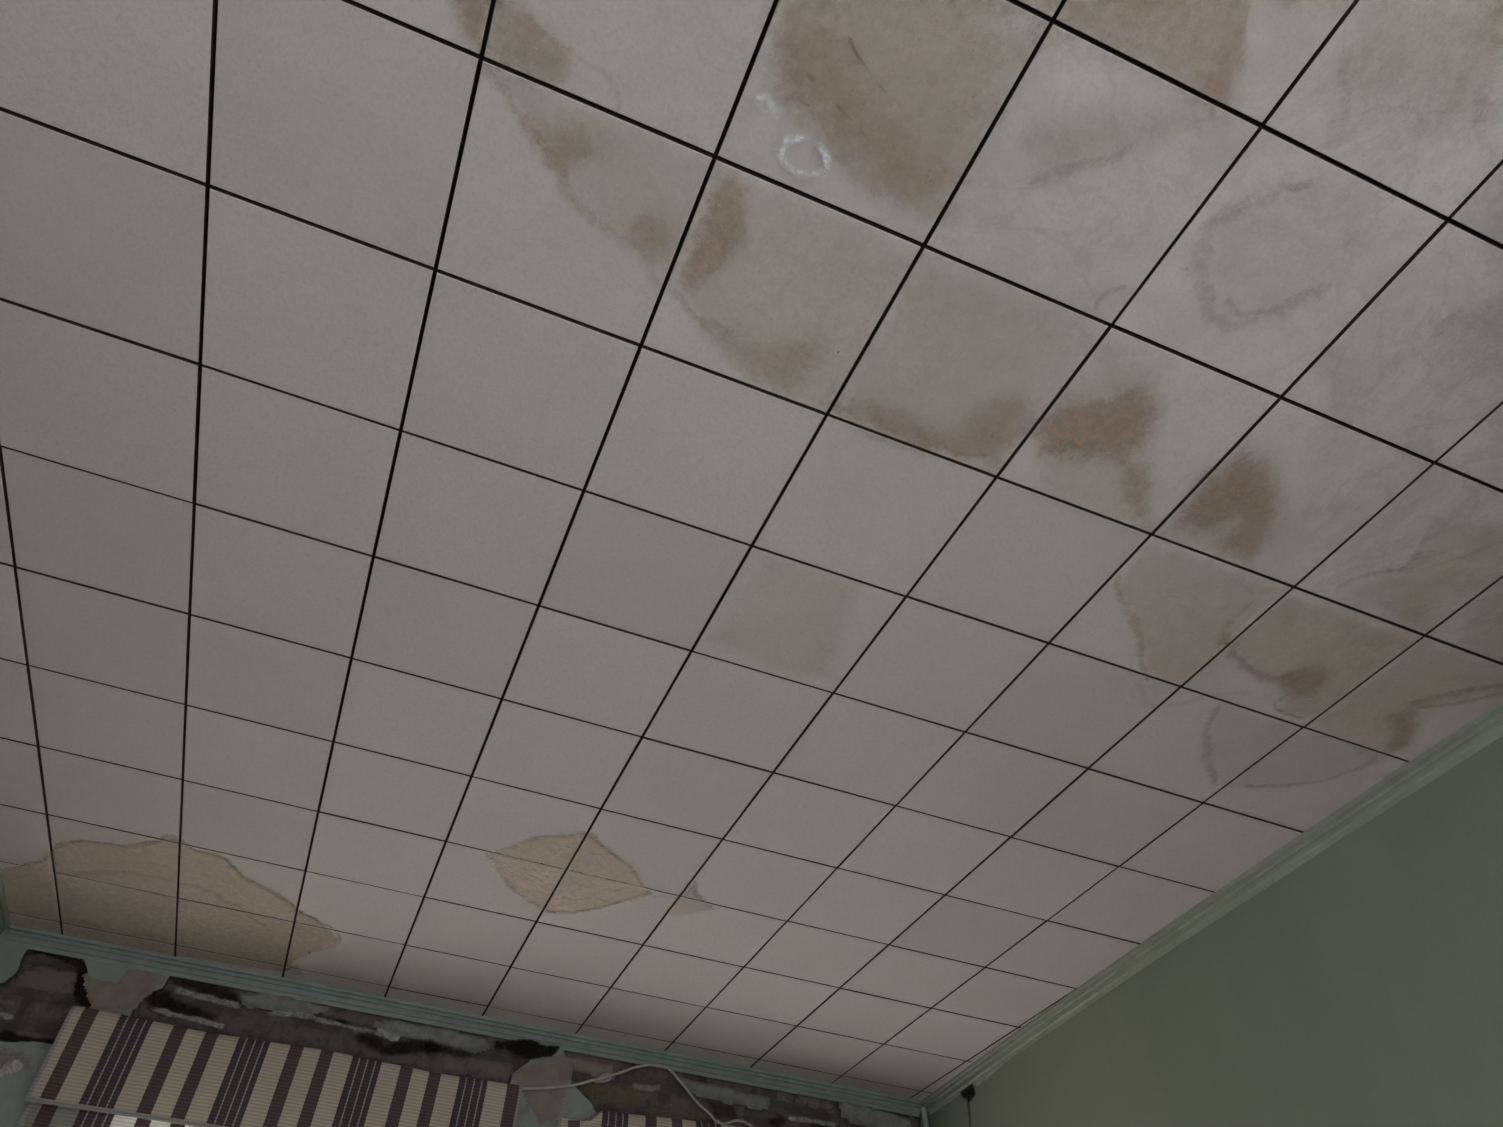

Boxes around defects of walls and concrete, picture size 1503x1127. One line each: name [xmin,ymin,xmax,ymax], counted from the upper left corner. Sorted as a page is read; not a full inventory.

water stain [779,135,831,177]
flaking render [0,950,91,1076]
spalling [132,977,919,1127]